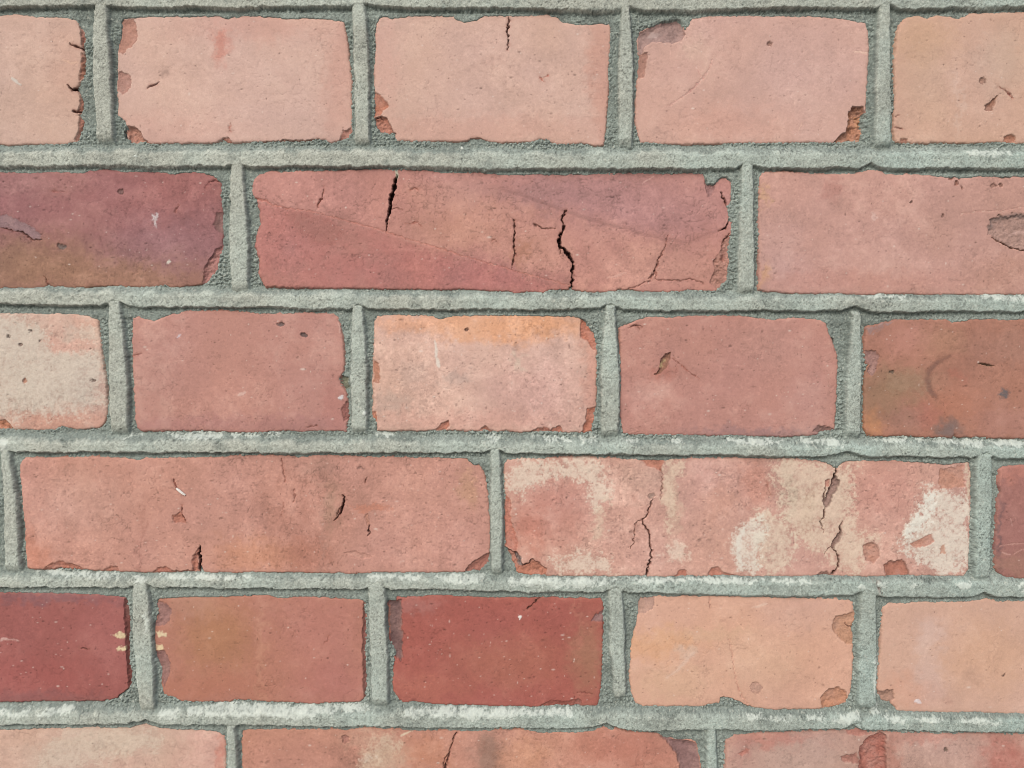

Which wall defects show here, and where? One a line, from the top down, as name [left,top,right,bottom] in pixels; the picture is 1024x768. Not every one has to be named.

spalling [834,106,865,143]
crack [385,170,423,231]
crack [491,210,577,290]
crack [629,468,664,576]
damp [504,432,973,590]
crack [816,468,844,575]